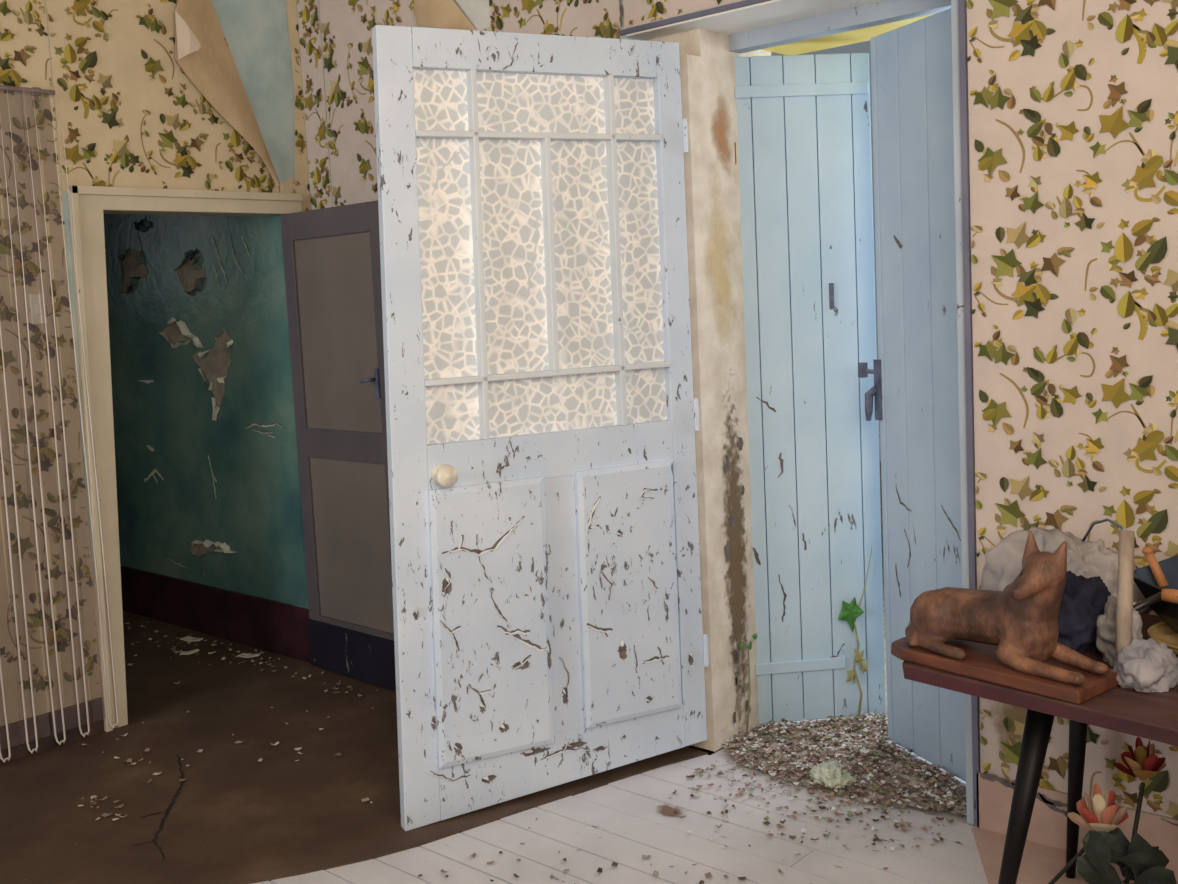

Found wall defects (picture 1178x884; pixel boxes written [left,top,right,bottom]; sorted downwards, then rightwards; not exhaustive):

peeling [453,0,491,31]
peeling [134,217,151,233]
peeling [174,248,206,296]
peeling [160,318,234,421]
peeling [189,540,236,557]
crack [132,755,186,862]